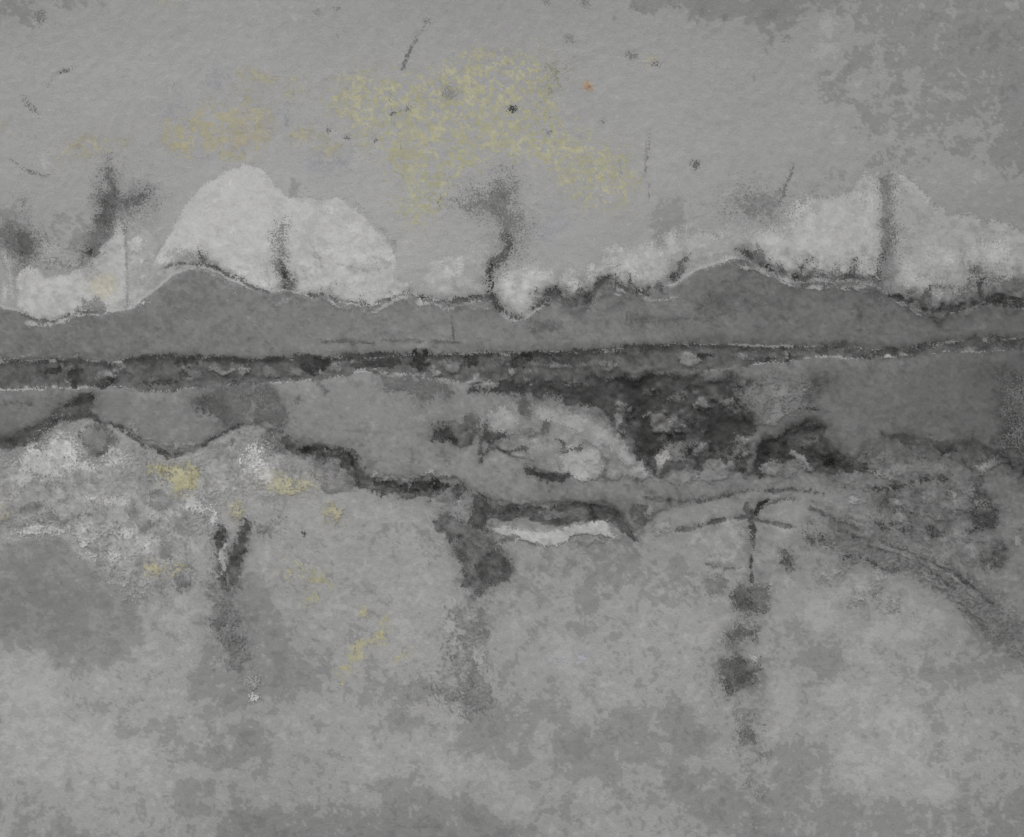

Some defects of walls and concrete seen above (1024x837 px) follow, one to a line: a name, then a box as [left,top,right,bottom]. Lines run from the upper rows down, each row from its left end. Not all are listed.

leakage [0,27,1024,320]
crack [0,420,60,449]
crack [109,422,240,461]
leakage [0,366,353,704]
spalling [261,427,467,508]
leakage [327,485,528,730]
crack [0,243,1024,395]
spalling [427,368,1024,667]
leakage [688,546,797,837]
leakage [798,516,899,574]